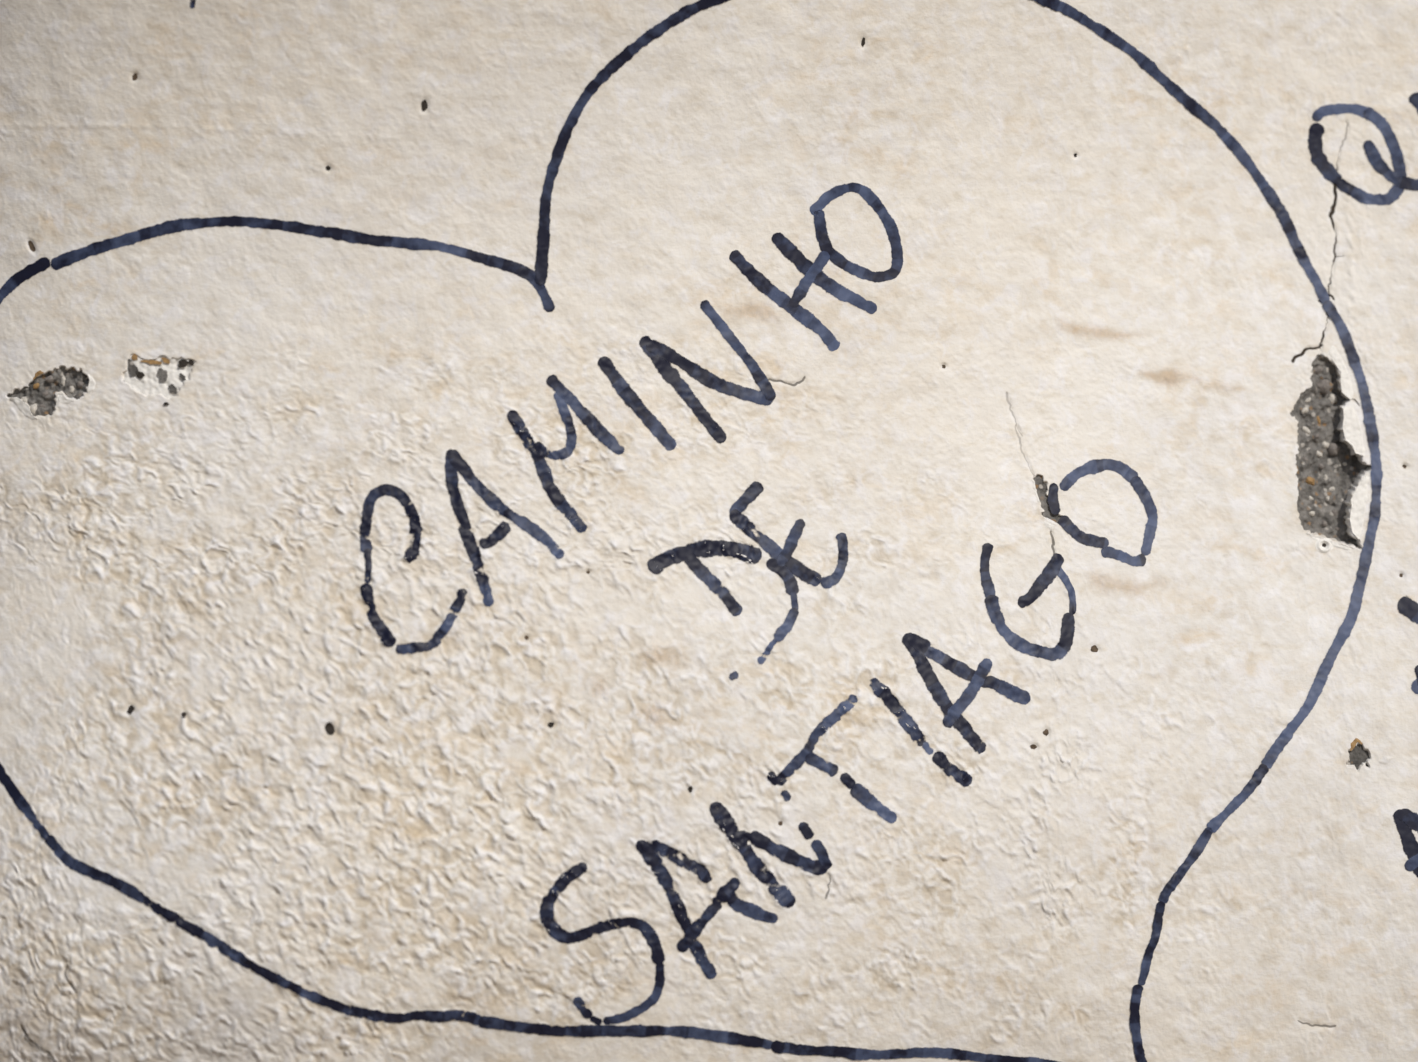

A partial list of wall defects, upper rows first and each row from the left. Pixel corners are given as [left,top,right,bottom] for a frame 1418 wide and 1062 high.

crack [1291,184,1341,363]
spalling [7,367,96,420]
spalling [124,354,195,405]
spalling [1290,345,1371,553]